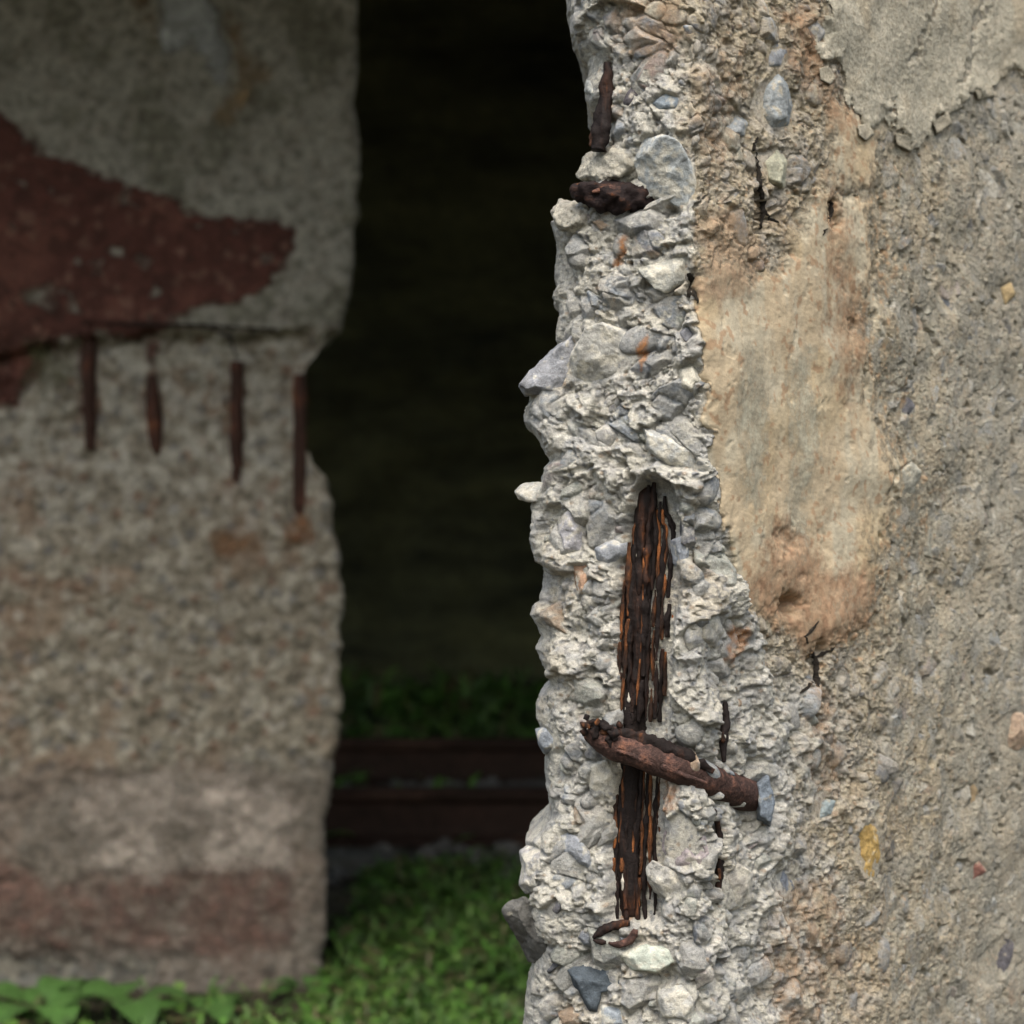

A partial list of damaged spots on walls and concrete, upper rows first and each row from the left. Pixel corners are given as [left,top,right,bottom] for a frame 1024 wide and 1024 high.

flaking render [814,0,1024,152]
crack [752,137,779,230]
rust [0,112,296,418]
spalling [502,0,852,1024]
crack [800,621,835,694]